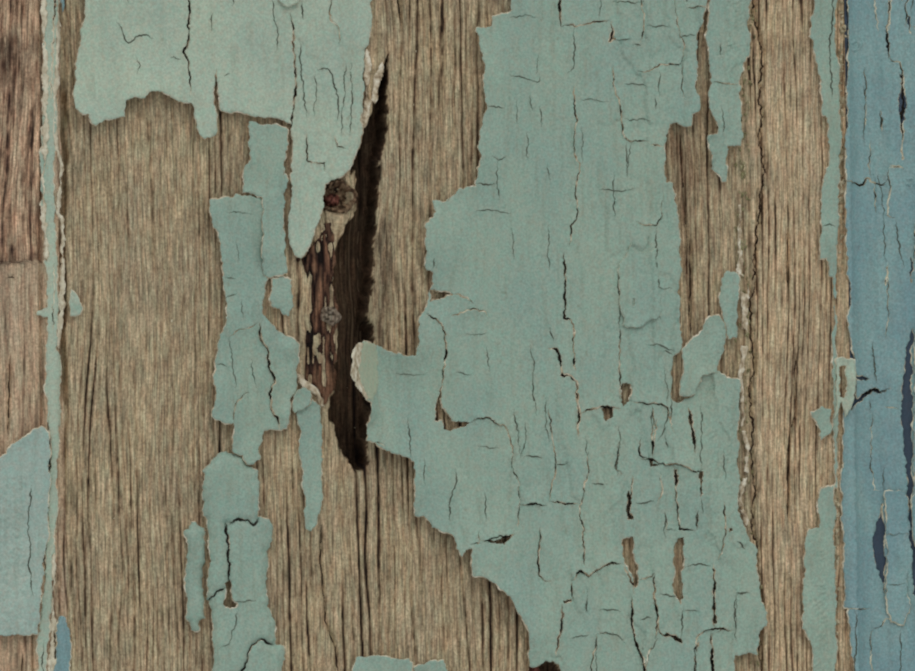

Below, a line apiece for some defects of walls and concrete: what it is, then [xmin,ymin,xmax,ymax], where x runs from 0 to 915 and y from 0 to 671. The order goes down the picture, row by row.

crack [116,21,150,73]
crack [173,0,234,84]
crack [272,1,353,169]
crack [827,0,835,94]
crack [845,0,915,265]
peeling [0,0,83,671]
peeling [72,0,384,671]
crack [396,315,490,378]
peeling [350,0,768,671]
crack [475,0,766,671]
crack [861,343,887,426]
crack [854,609,902,671]